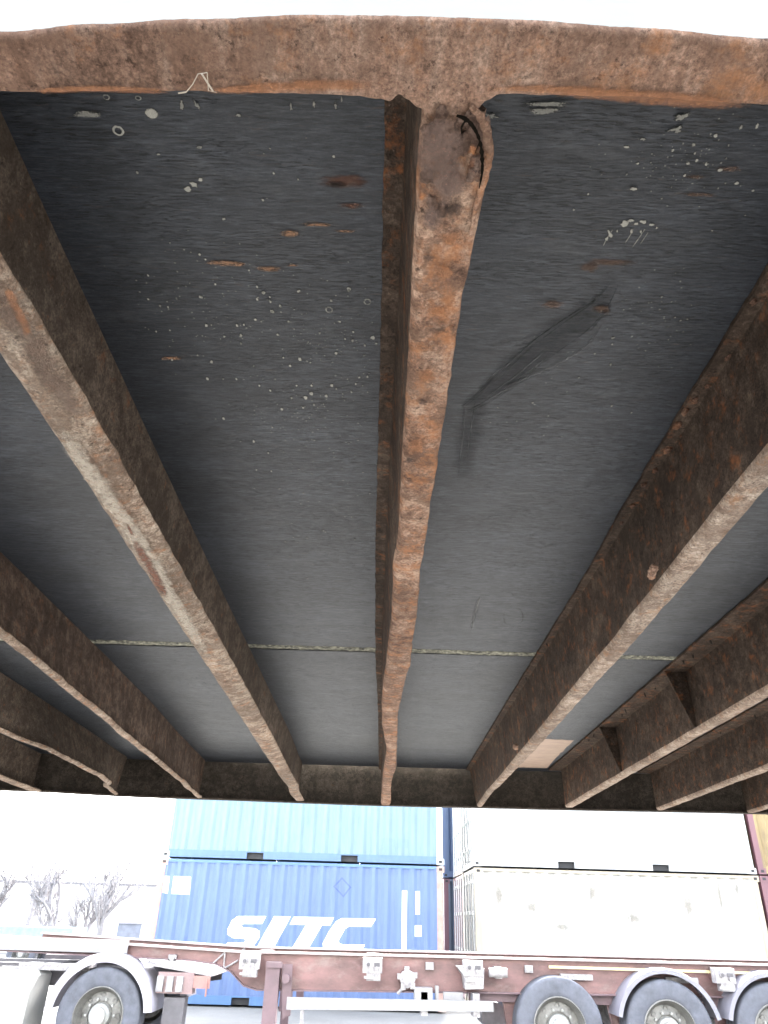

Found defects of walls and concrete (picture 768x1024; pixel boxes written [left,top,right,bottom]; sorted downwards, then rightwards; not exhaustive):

corrosion [220,81,356,93]
corrosion [508,86,721,107]
crack [456,114,485,189]
corrosion [446,204,461,217]
corrosion [0,291,79,415]
corrosion [647,564,659,580]